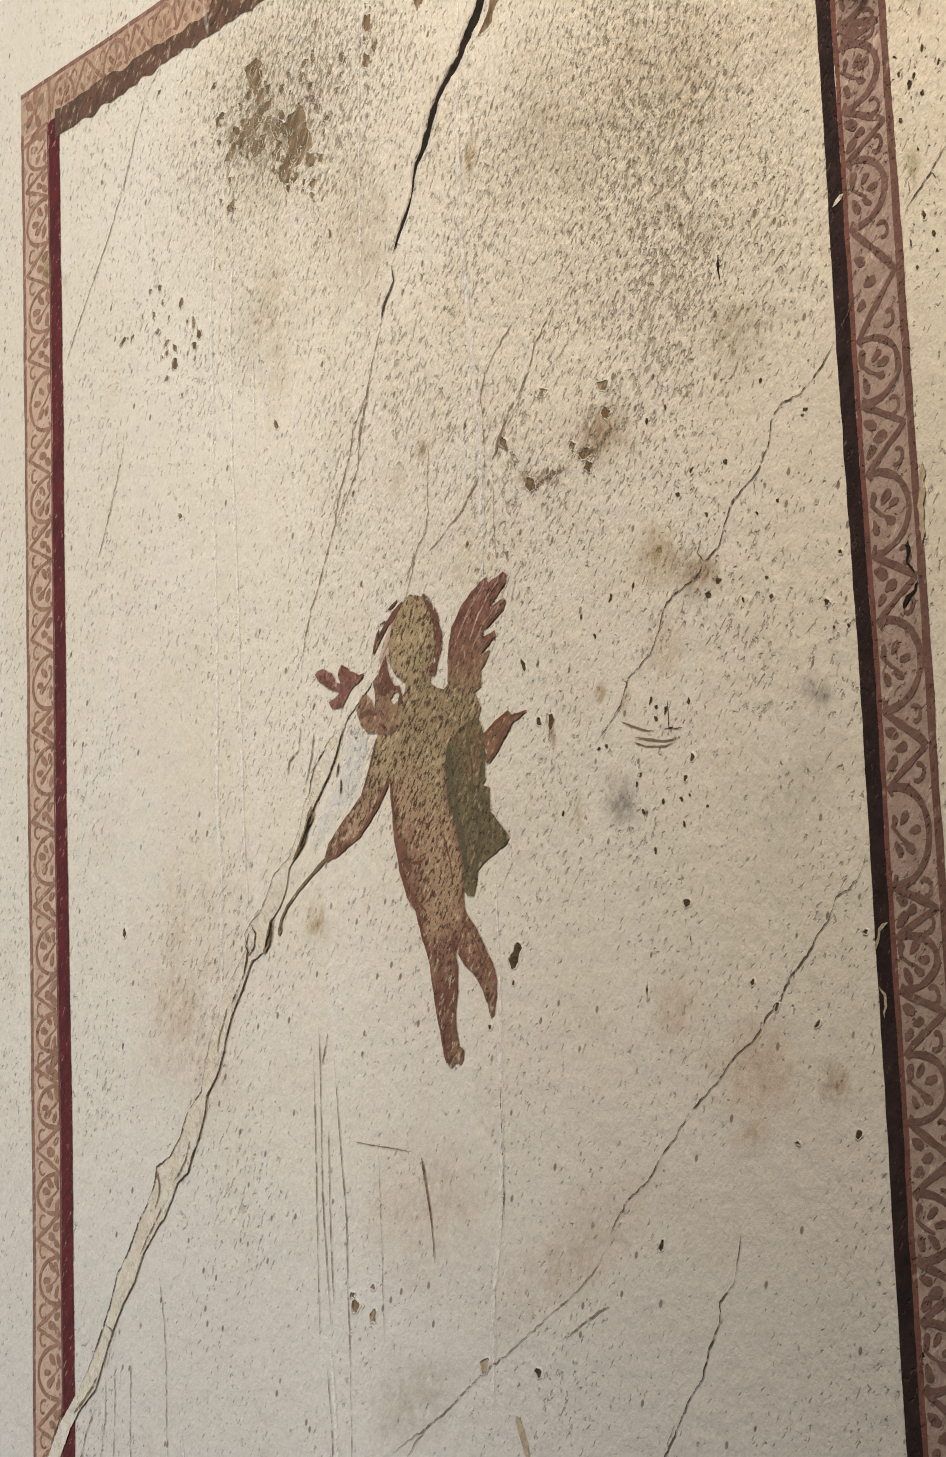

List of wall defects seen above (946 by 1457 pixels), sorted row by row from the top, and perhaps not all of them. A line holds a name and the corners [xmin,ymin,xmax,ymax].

crack [99,445,124,554]
crack [65,68,160,365]
flaking render [215,0,379,213]
crack [301,0,501,669]
crack [404,301,556,594]
crack [595,287,862,744]
crack [48,681,372,1457]
crack [393,859,865,1457]